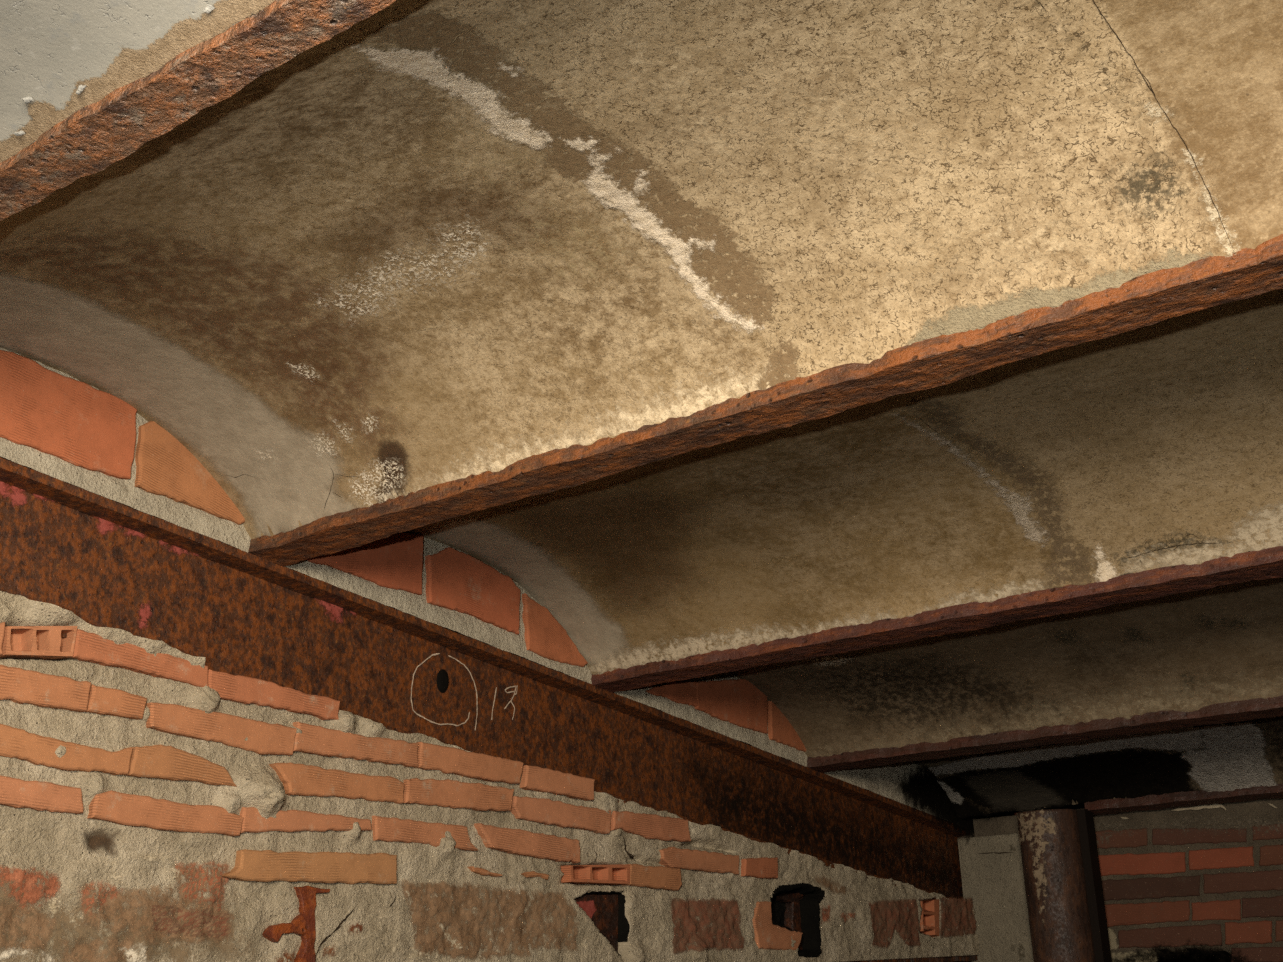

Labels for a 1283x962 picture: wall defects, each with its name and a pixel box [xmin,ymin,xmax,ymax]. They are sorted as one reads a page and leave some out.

peeling [0,0,275,162]
crack [1093,0,1235,253]
damp [351,30,765,333]
damp [893,209,1100,274]
damp [349,365,795,505]
damp [894,414,1049,547]
damp [1094,504,1283,582]
damp [912,579,1044,617]
damp [589,613,895,675]
damp [814,657,1283,744]
damp [938,781,964,805]
spalling [86,832,113,853]